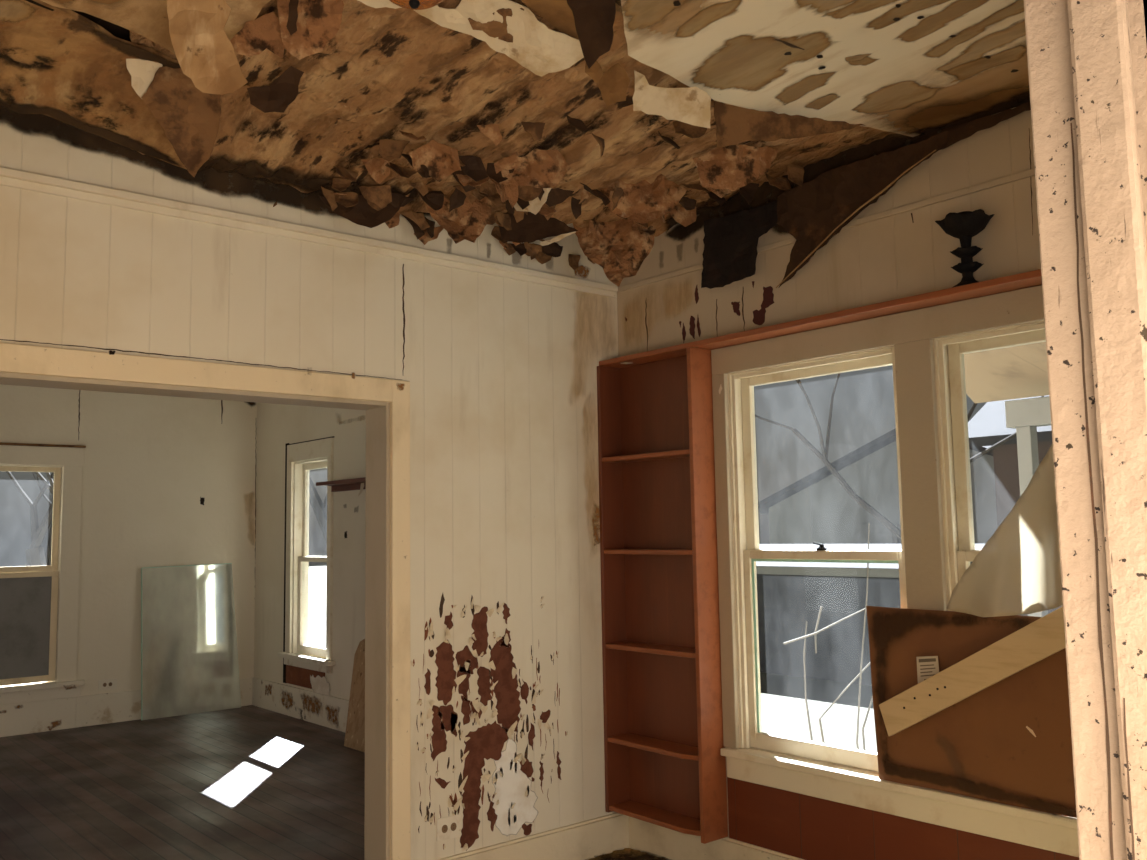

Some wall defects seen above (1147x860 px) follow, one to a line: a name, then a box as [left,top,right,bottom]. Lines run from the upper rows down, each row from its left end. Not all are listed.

leakage [93,30,181,69]
leakage [0,49,442,216]
leakage [447,89,530,142]
leakage [518,113,607,157]
leakage [639,115,679,145]
leakage [665,0,1030,241]
crack [0,264,405,380]
peeling [679,285,701,343]
peeling [731,281,774,325]
crack [251,438,259,550]
peeling [265,675,339,726]
peeling [410,593,568,852]